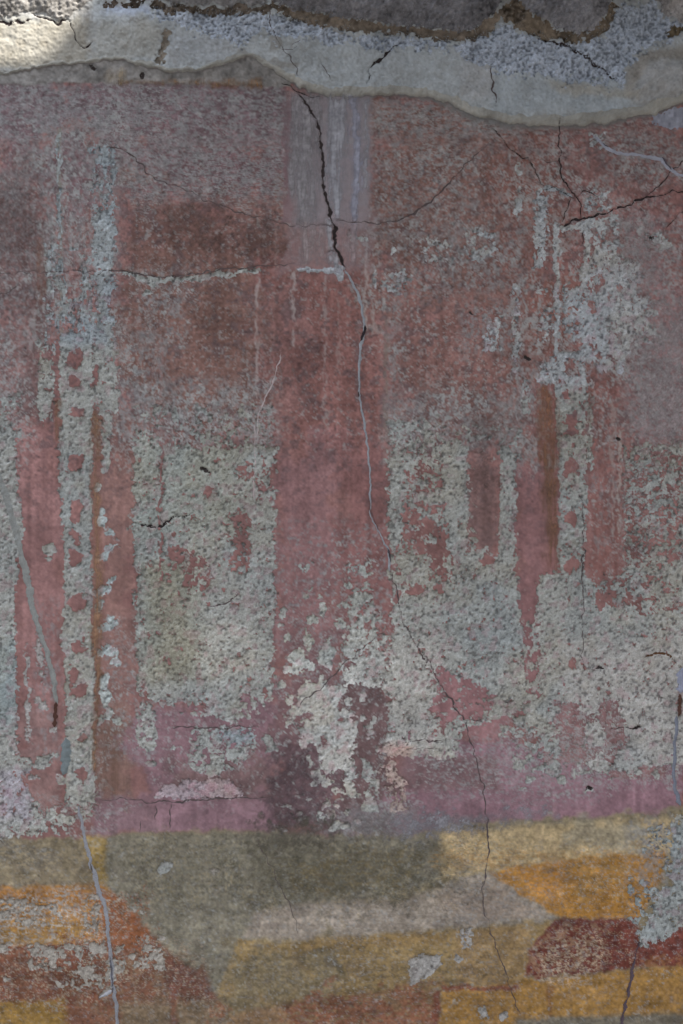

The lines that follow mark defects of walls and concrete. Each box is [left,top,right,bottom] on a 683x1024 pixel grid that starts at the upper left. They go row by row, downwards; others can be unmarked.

crack [538,38,614,79]
crack [0,264,288,294]
crack [495,122,683,246]
peeling [0,132,262,839]
crack [105,3,521,1015]
spalling [131,162,683,832]
crack [0,473,72,775]
crack [77,806,119,1024]
crack [620,937,640,1024]
spalling [627,814,683,948]